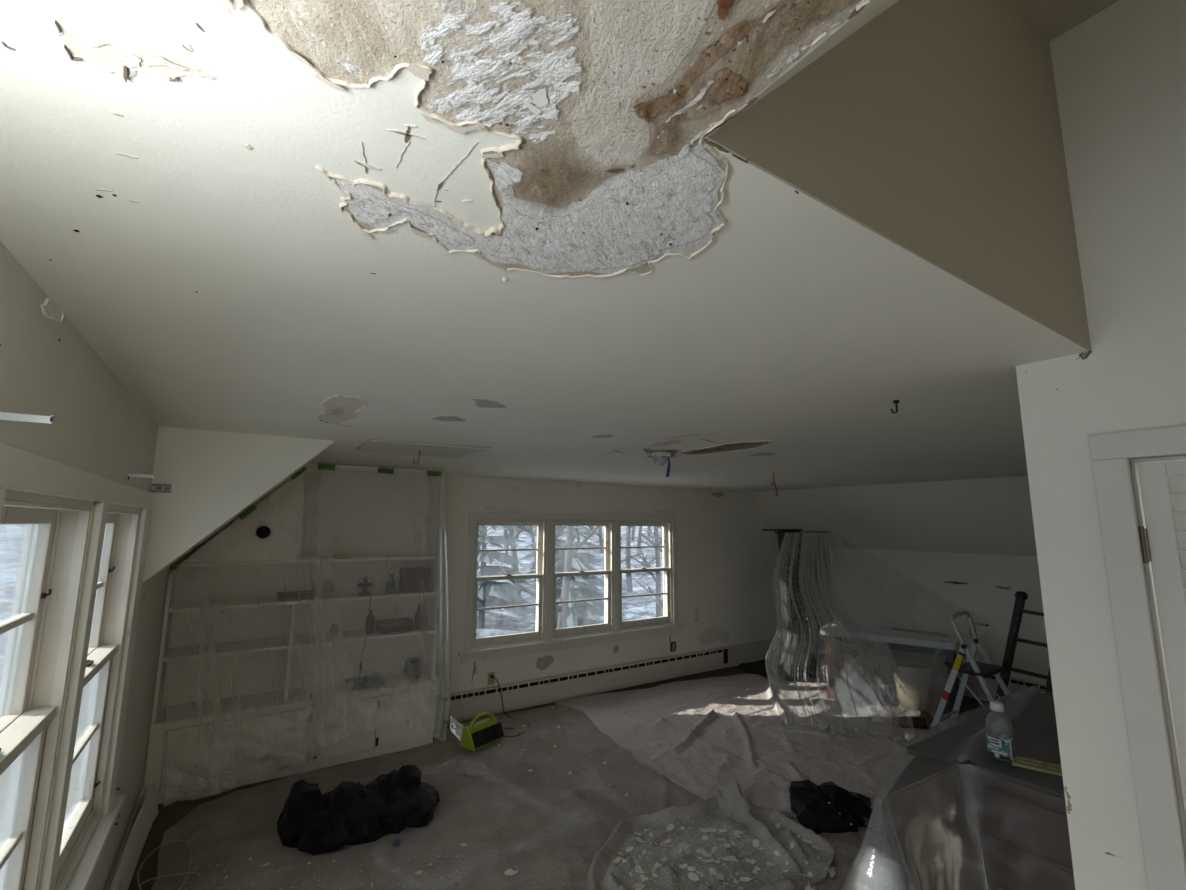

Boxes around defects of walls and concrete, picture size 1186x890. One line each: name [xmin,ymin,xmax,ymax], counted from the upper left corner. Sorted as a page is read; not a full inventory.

peeling [50,15,217,83]
crack [362,125,425,165]
crack [434,142,478,202]
peeling [223,0,870,278]